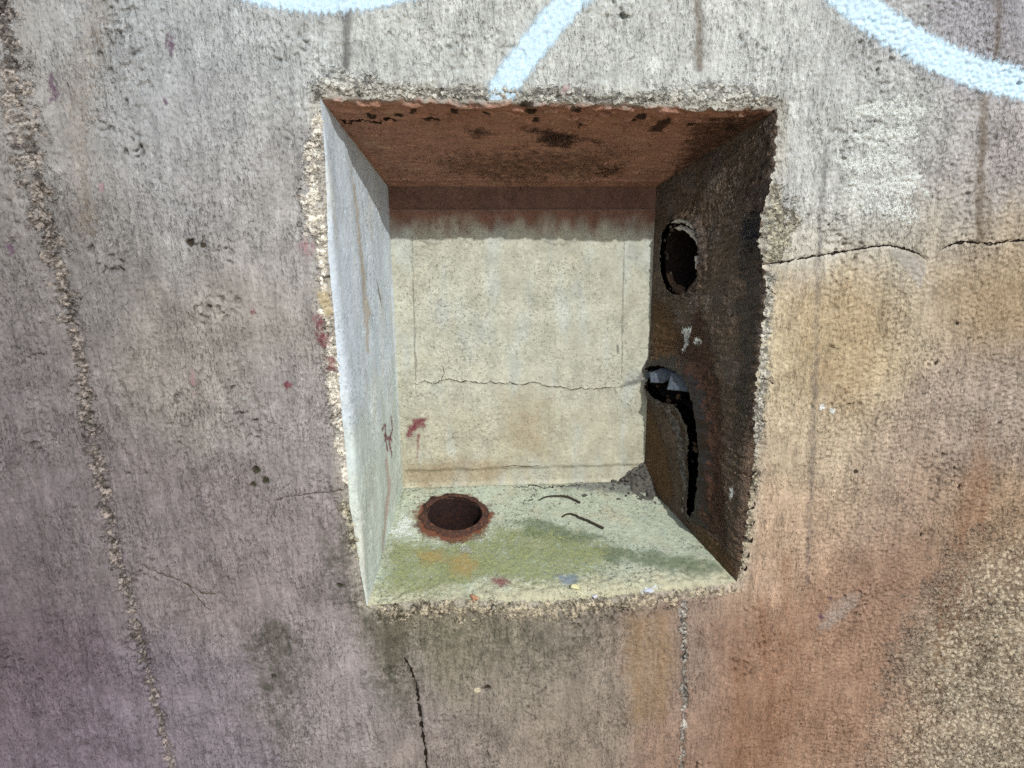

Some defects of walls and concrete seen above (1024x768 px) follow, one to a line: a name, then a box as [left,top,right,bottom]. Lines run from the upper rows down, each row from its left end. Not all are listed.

spalling [294,63,779,561]
crack [760,238,1024,294]
crack [417,365,615,390]
rust [413,496,494,544]
spalling [373,180,810,768]
rust [645,405,673,504]
rust [679,310,735,576]
crack [404,657,428,768]